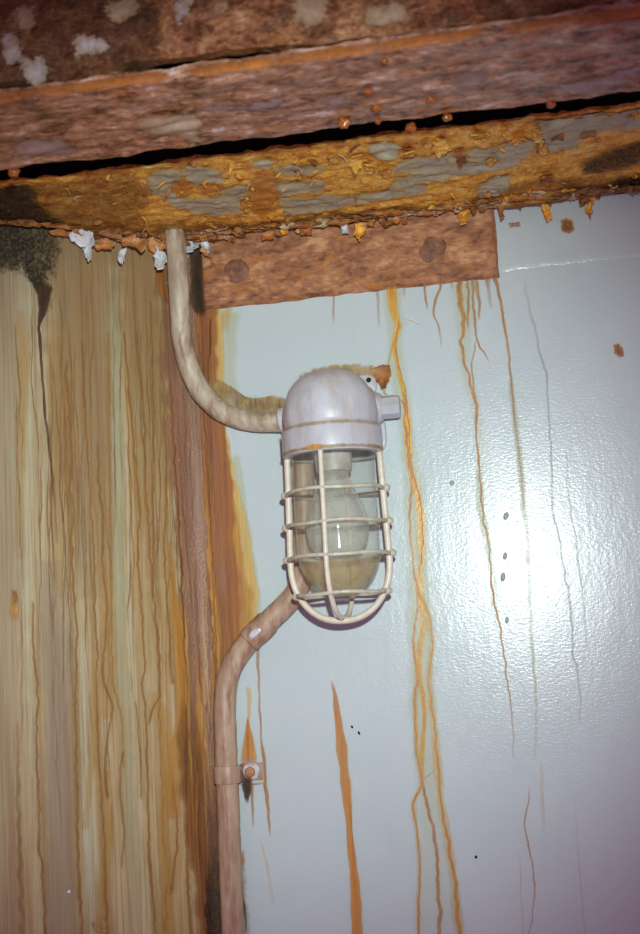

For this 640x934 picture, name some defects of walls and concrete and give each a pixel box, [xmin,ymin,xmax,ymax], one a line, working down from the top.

peeling [69,229,95,262]
damp [124,237,165,394]
peeling [153,246,167,270]
peeling [146,165,250,218]
peeling [137,98,285,147]
peeling [252,109,640,216]
damp [0,185,125,655]
corrosion [457,276,514,711]
corrosion [113,241,257,934]
corrosion [370,282,462,934]
corrosion [242,655,270,826]
corrosion [332,688,363,934]